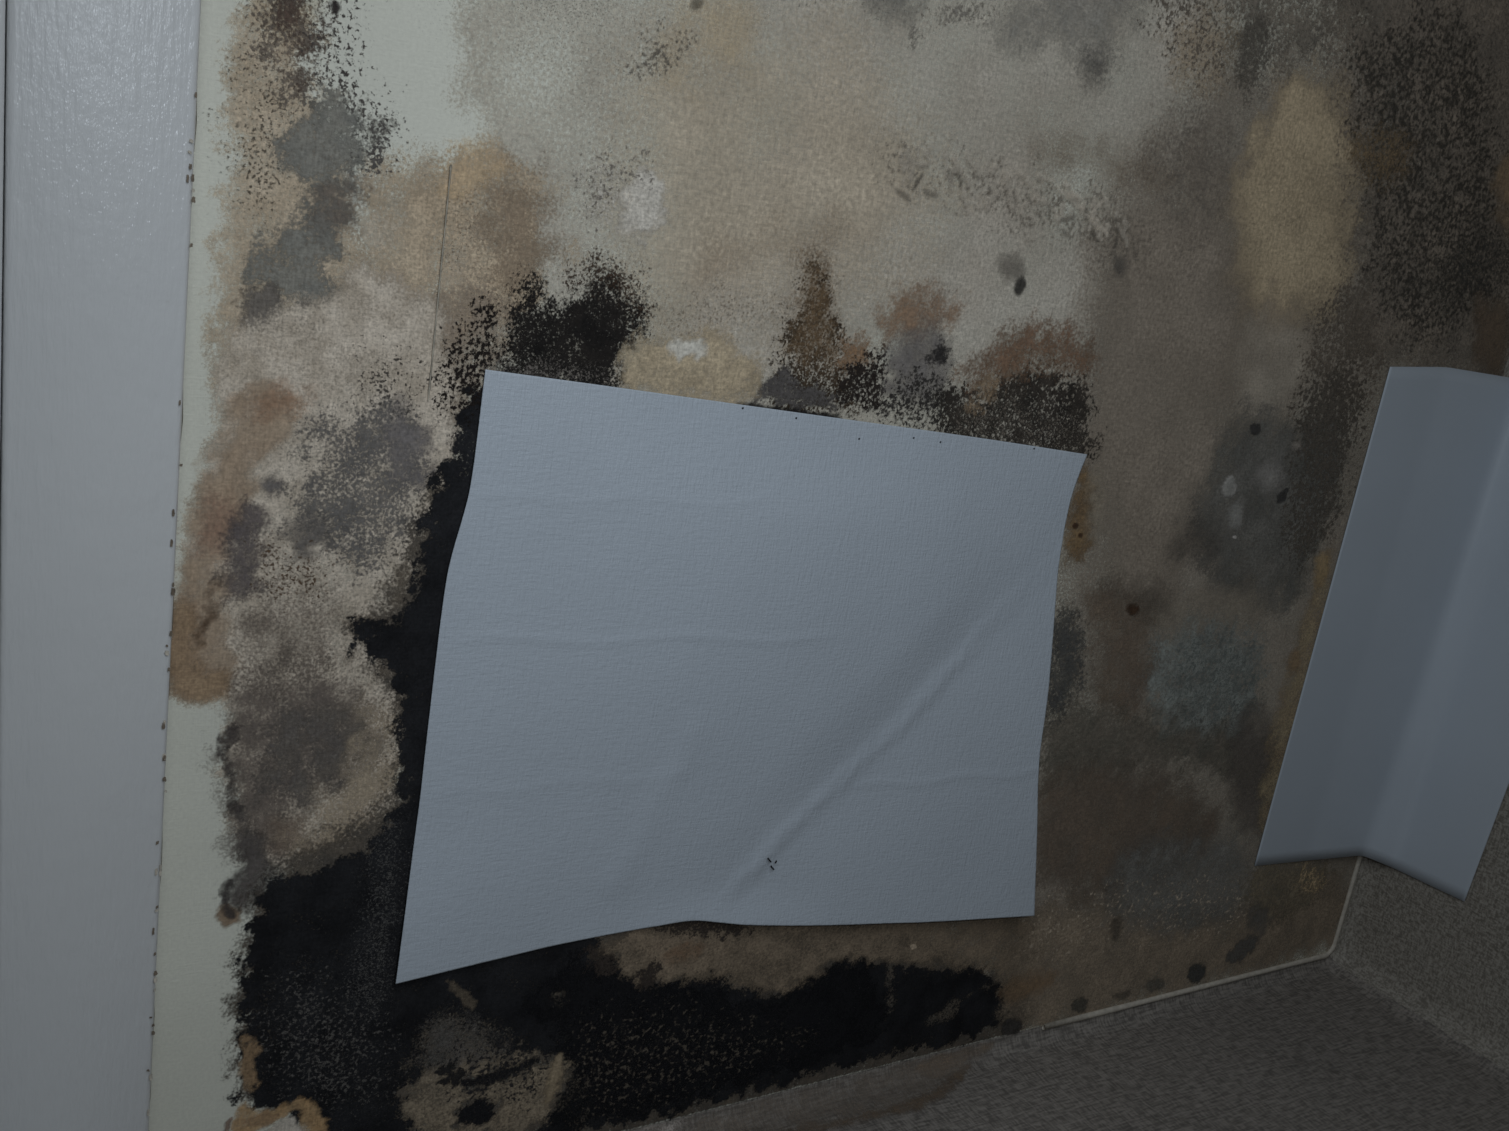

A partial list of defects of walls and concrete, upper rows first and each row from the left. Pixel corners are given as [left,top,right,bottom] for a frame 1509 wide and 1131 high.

water stain [315,0,359,40]
water stain [320,43,362,97]